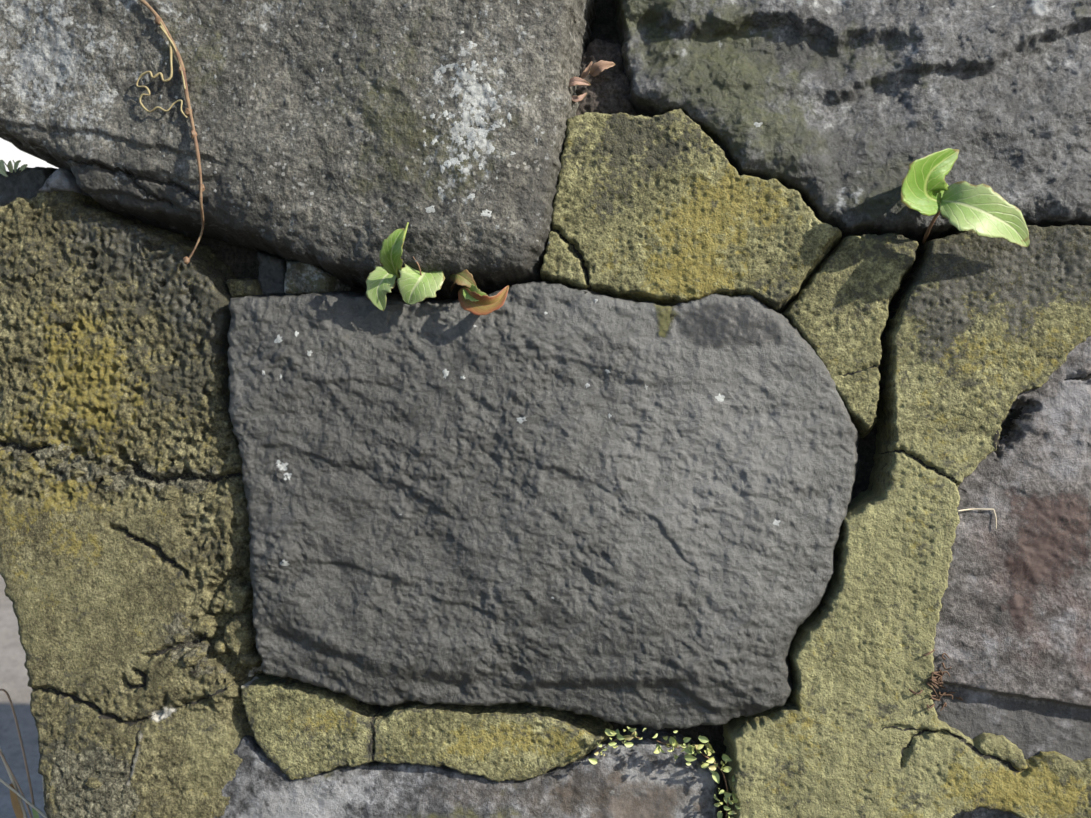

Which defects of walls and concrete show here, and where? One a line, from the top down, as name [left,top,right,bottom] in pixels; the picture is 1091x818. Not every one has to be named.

crack [1064,373,1091,381]
crack [0,442,50,454]
crack [96,458,243,487]
crack [113,527,187,573]
crack [127,633,208,689]
crack [32,677,246,794]
crack [880,726,1029,773]